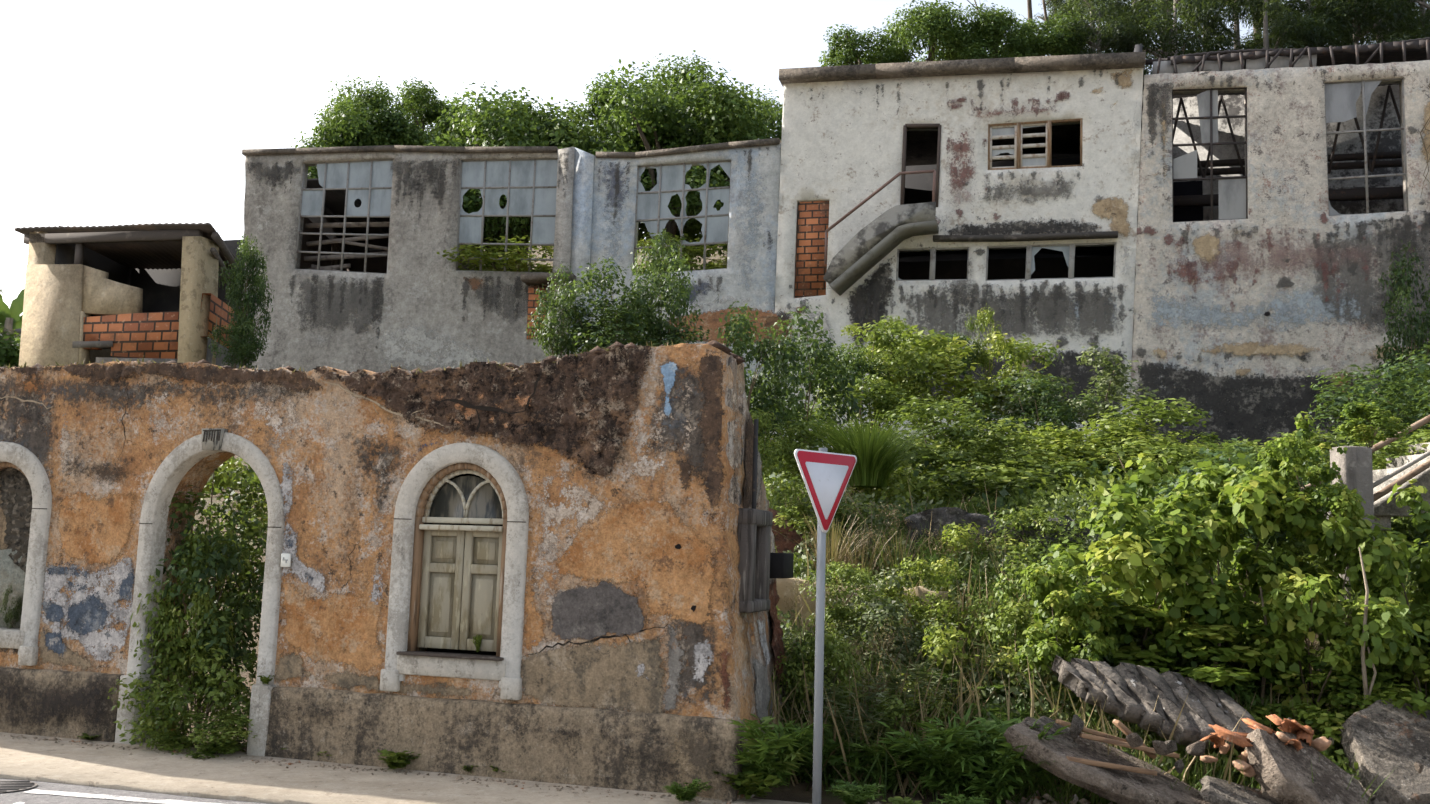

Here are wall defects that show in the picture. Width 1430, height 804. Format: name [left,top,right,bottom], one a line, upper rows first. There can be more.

spalling [1092,196,1131,274]
damp [290,274,384,348]
damp [460,276,542,324]
damp [777,285,809,321]
damp [832,163,1430,451]
spalling [0,295,837,727]
crack [523,624,668,657]
damp [0,679,104,729]